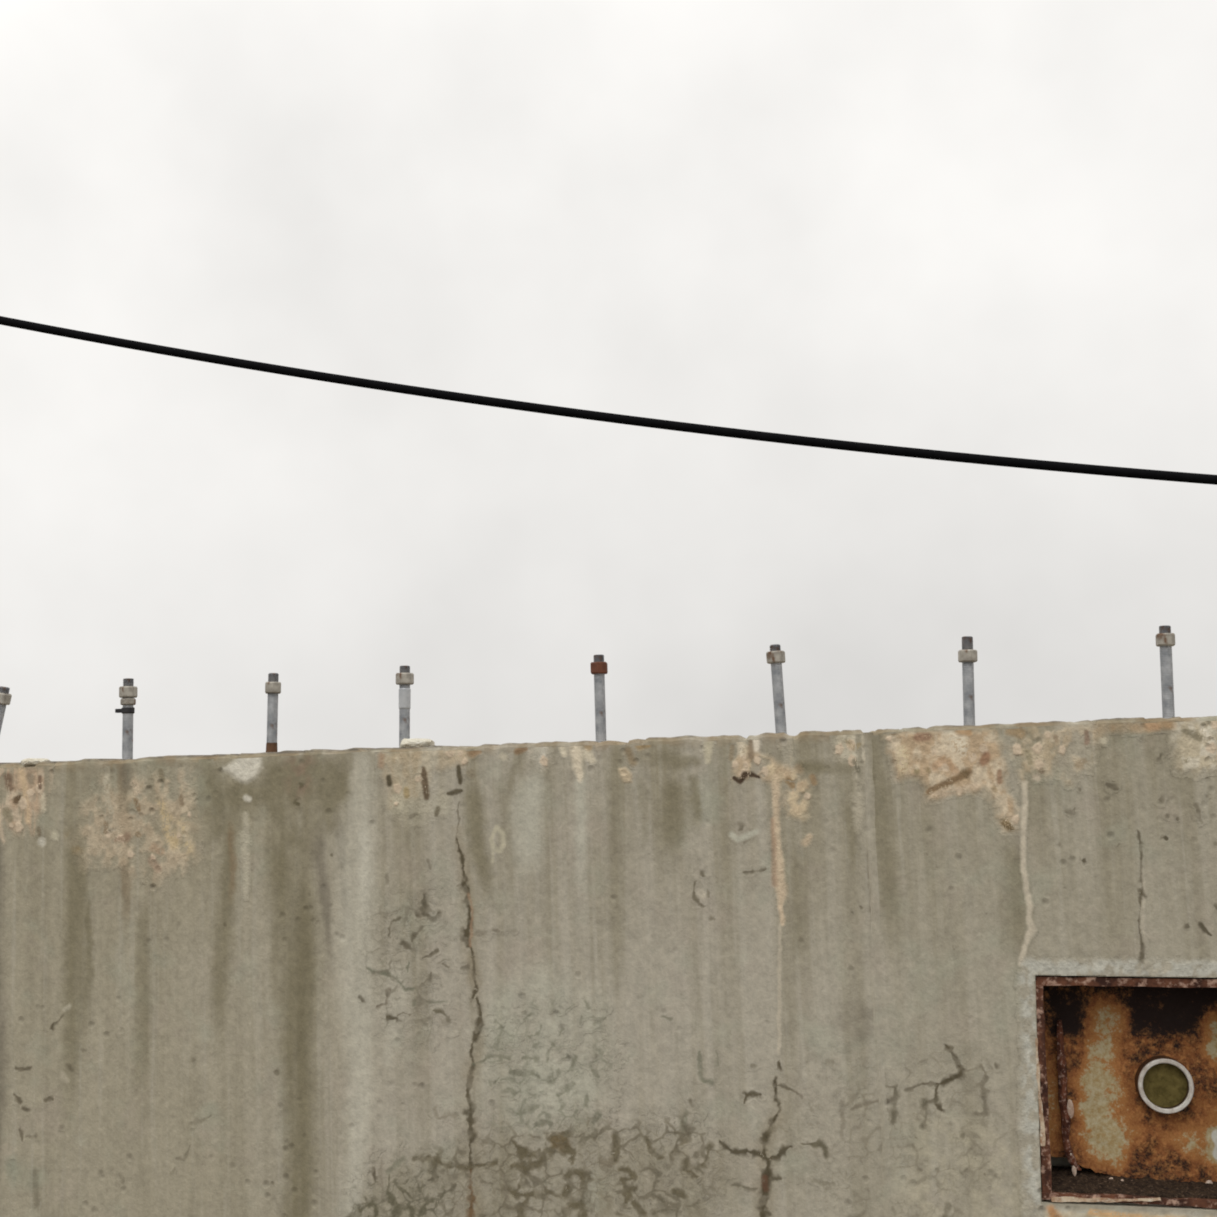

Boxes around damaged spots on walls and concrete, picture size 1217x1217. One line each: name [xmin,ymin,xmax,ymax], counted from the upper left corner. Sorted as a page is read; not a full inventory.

spalling [0,758,208,893]
spalling [699,739,819,928]
spalling [830,720,1217,847]
water stain [0,831,48,1217]
water stain [53,817,97,1147]
water stain [116,873,158,1126]
crack [338,800,1020,1217]